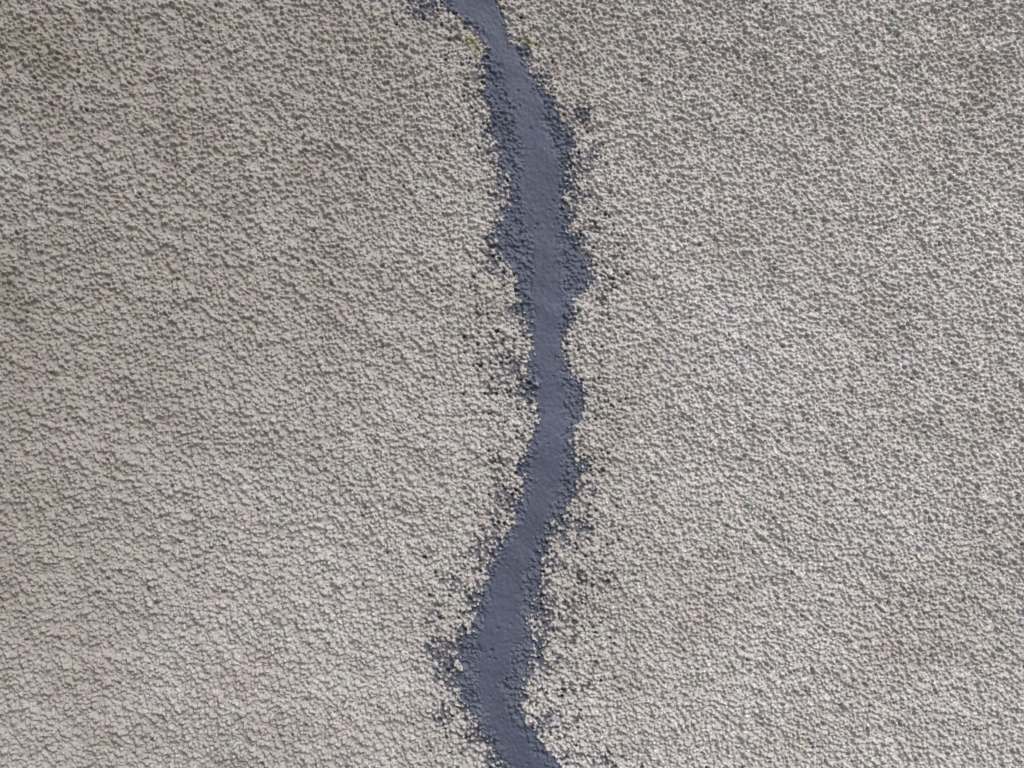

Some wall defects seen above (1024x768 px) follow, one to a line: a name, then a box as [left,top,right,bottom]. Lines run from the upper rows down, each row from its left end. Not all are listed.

crack [369,0,655,768]